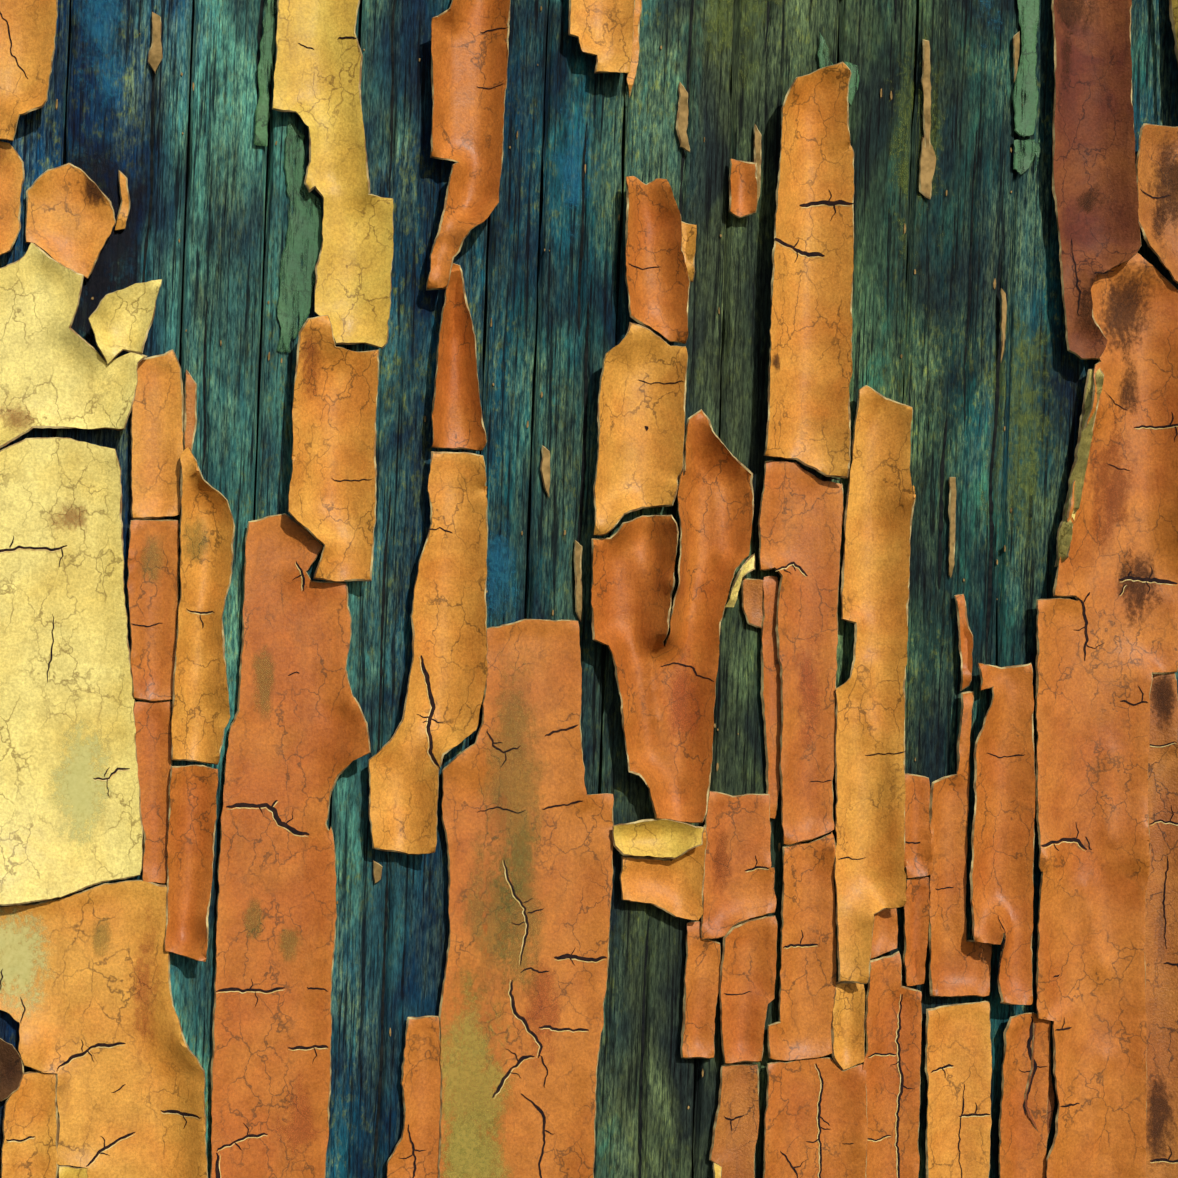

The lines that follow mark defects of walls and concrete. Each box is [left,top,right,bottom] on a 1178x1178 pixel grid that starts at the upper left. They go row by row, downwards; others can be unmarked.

crack [0,12,28,79]
crack [800,190,854,221]
crack [775,238,825,263]
peeling [0,0,394,1178]
peeling [368,0,1178,1178]
crack [1119,567,1178,596]
crack [1077,592,1104,660]
crack [417,655,443,769]
crack [226,800,309,837]
crack [1041,823,1092,850]
crack [492,860,607,1178]